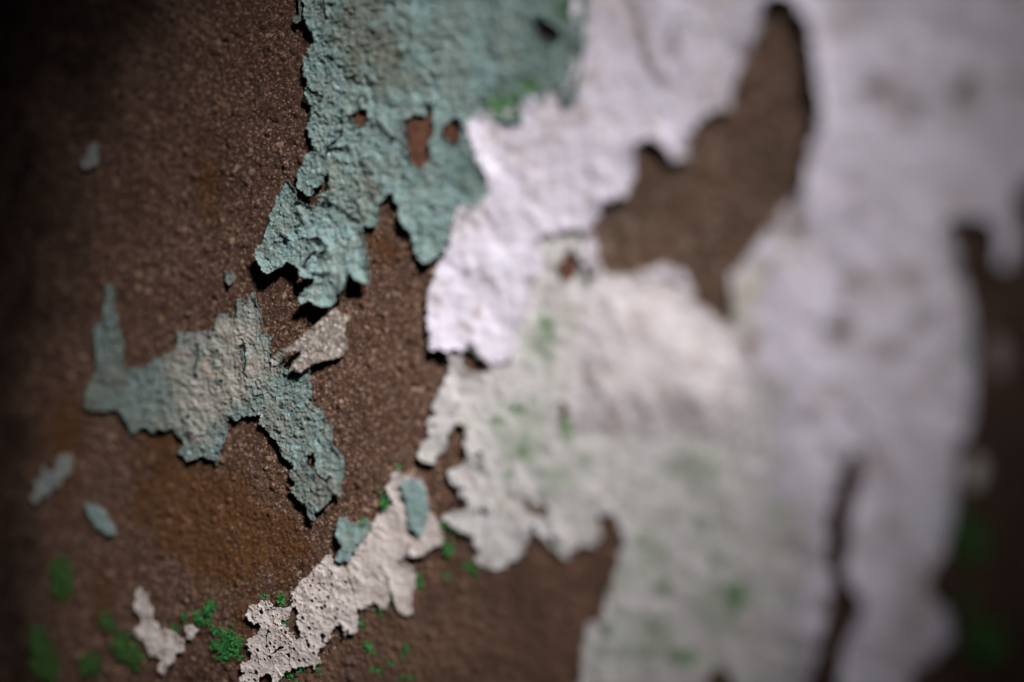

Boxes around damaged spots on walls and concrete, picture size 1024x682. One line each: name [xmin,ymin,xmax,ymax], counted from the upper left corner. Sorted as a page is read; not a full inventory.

peeling [84,503,117,536]
peeling [133,588,199,675]
peeling [83,283,351,521]
peeling [239,0,1024,682]